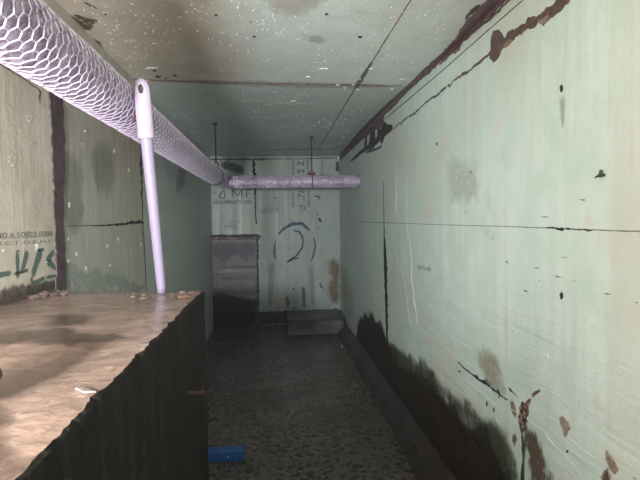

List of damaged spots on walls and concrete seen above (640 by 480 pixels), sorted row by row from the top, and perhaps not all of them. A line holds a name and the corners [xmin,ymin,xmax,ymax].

crack [134,0,570,224]
crack [371,222,640,375]
water stain [356,313,518,480]
crack [458,362,518,401]
spalling [509,389,541,446]
spalling [559,416,571,438]
spalling [600,449,619,480]